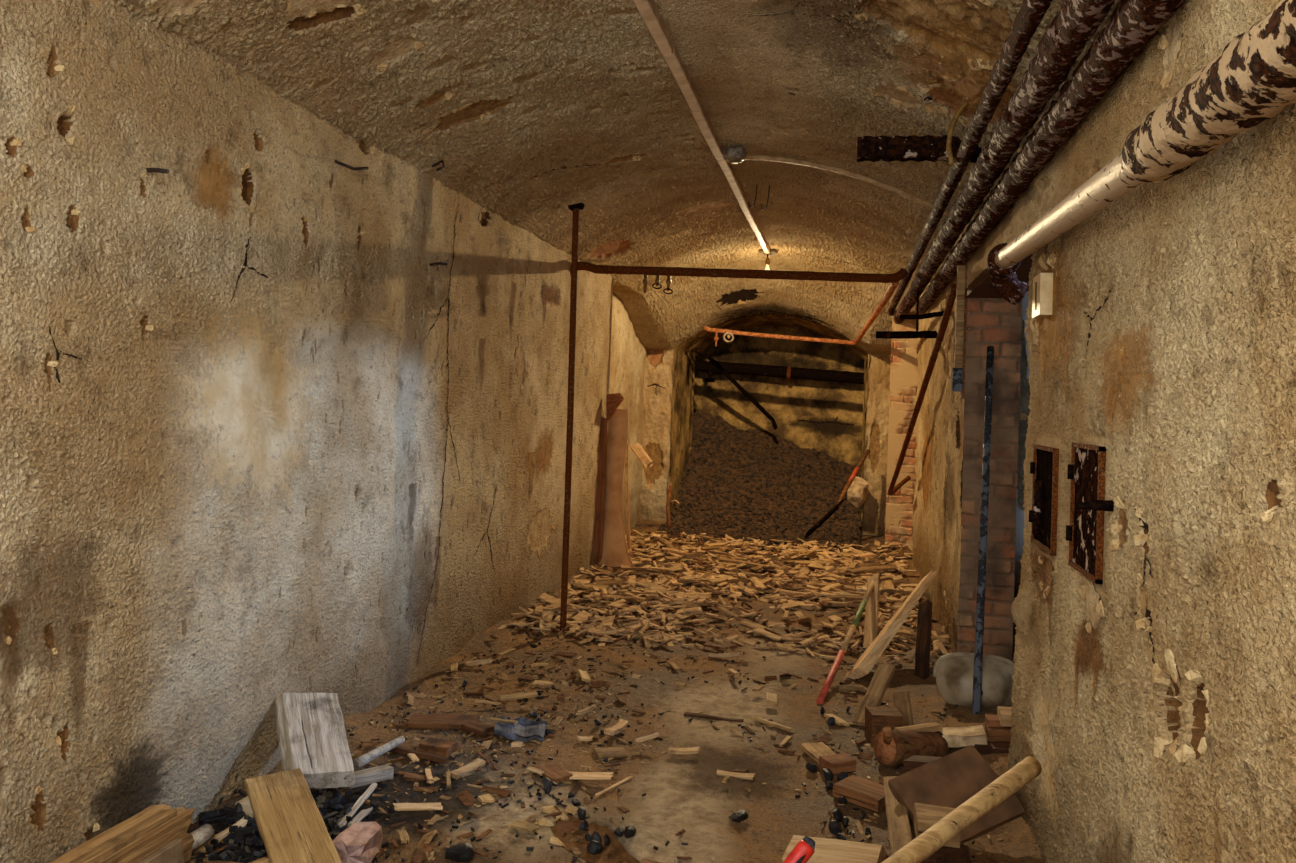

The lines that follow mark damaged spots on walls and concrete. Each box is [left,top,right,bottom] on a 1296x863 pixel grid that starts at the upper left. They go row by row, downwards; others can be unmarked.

peeling [1016,252,1058,510]
crack [1084,289,1112,354]
crack [1134,508,1155,663]
flaking render [1151,649,1209,764]